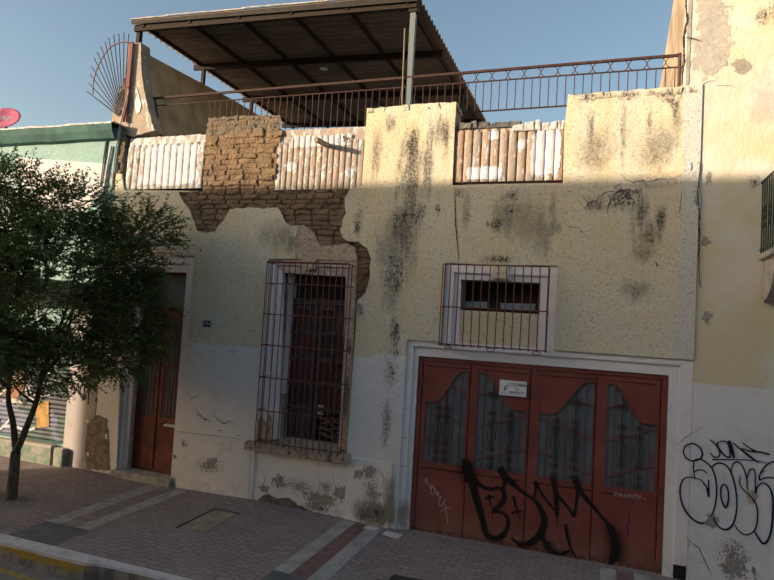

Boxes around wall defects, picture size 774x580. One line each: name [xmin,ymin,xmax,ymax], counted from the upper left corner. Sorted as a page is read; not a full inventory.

peeling [691,0,752,82]
water stain [399,121,448,196]
spalling [137,115,371,320]
water stain [387,205,424,292]
crack [583,169,702,288]
crack [168,391,244,454]
peeling [258,474,345,512]
water stain [356,485,409,525]
peeling [704,512,719,529]
peeling [713,535,757,580]